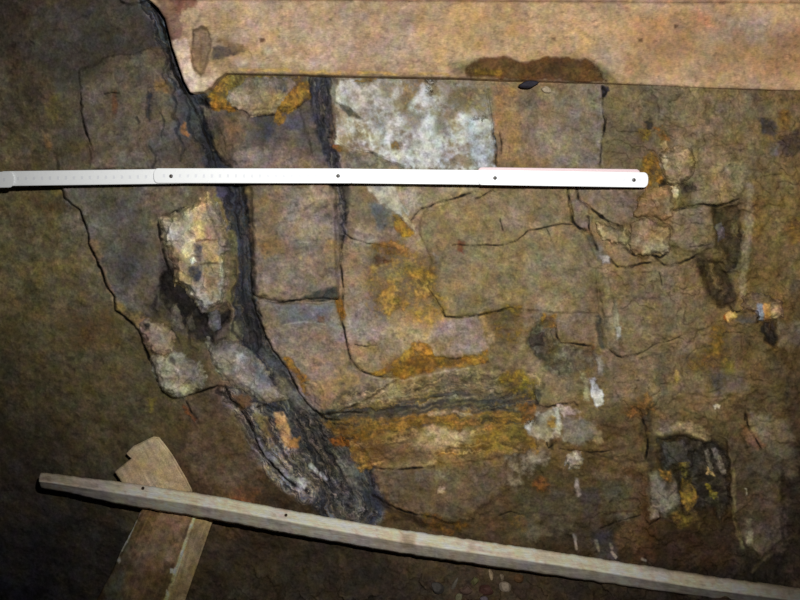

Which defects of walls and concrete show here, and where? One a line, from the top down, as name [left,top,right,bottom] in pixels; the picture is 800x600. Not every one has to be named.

water stain [334,56,616,170]
crack [431,293,506,318]